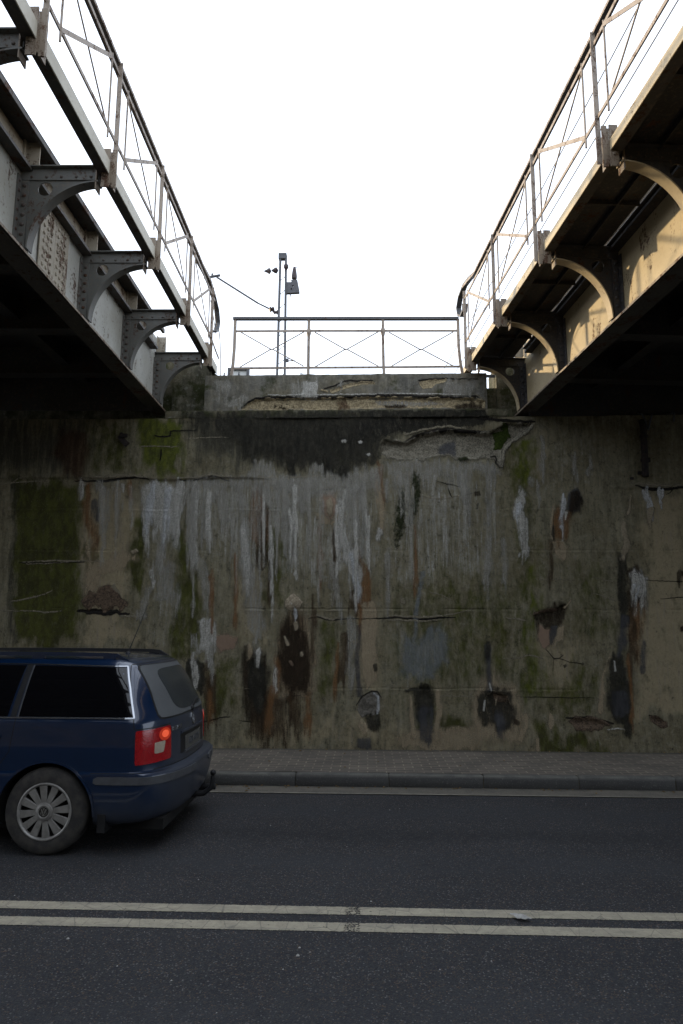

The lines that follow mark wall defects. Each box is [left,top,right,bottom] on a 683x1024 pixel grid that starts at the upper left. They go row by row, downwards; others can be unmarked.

crack [75,430,226,483]
crack [178,473,321,481]
spalling [240,378,535,489]
leakage [78,379,492,740]
spalling [77,584,147,618]
crack [307,598,473,622]
leakage [398,435,593,744]
spalling [533,599,572,649]
leakage [598,486,664,739]
peeling [356,600,382,750]
spalling [548,712,614,732]